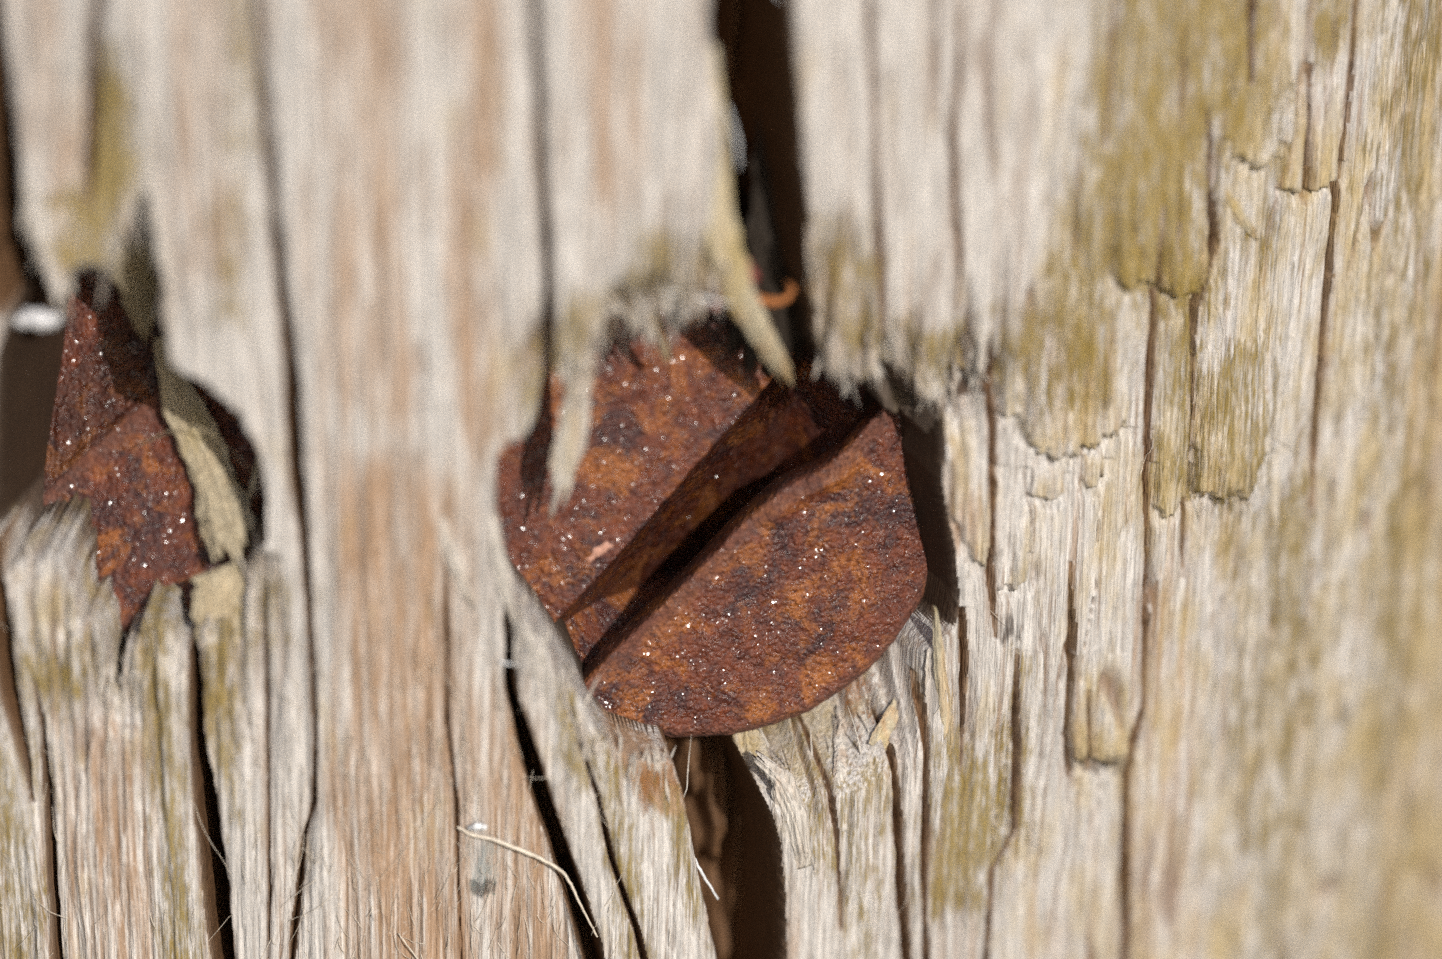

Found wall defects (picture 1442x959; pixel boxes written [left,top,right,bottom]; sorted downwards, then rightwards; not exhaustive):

crack [0,0,38,319]
crack [707,0,817,333]
crack [187,0,319,959]
crack [503,605,648,959]
crack [657,726,788,959]